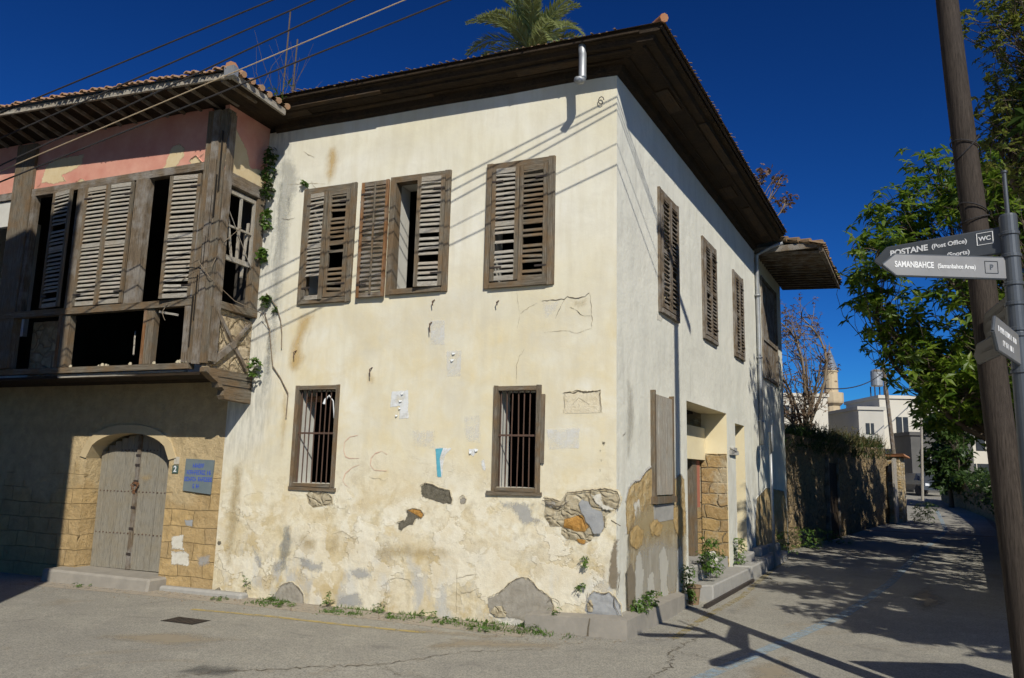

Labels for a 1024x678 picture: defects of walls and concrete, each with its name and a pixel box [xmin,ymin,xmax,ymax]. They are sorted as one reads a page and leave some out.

peeling [41,154,86,184]
peeling [163,143,204,171]
crack [517,293,593,333]
spalling [306,491,334,508]
spalling [397,482,467,531]
spalling [503,466,686,544]
spalling [487,576,560,620]
spalling [585,574,623,616]